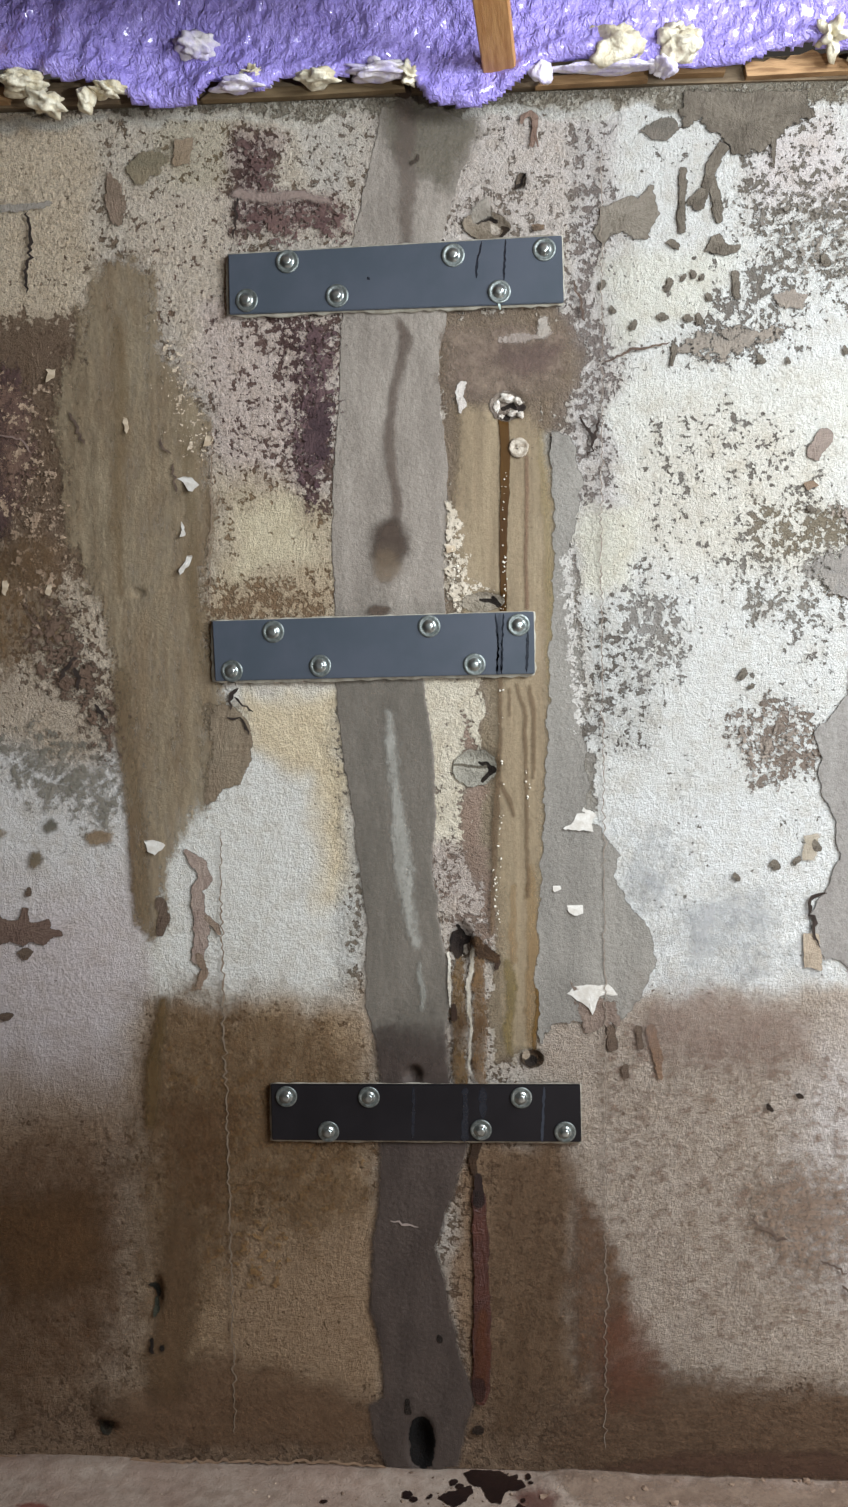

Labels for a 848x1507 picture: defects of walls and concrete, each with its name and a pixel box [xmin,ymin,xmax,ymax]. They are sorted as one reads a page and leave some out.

crack [23,211,34,293]
peeling [592,85,817,299]
peeling [657,270,809,366]
water stain [0,253,239,940]
water stain [373,321,411,580]
corrosion [498,420,529,611]
peeling [202,703,253,810]
water stain [337,679,450,1084]
peeling [521,428,848,1359]
crack [808,892,827,947]
water stain [112,985,848,1507]
corrosion [469,1143,492,1406]